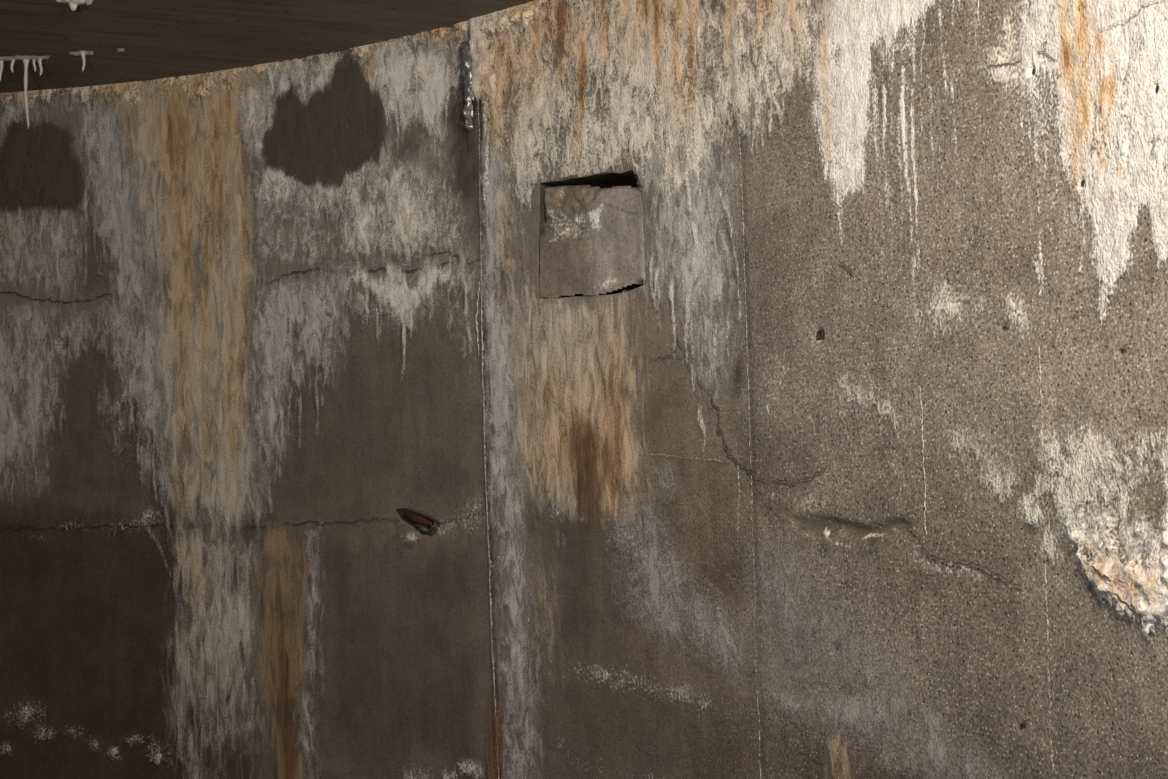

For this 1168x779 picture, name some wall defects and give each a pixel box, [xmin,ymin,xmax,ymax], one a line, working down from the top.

damp [56,0,93,11]
damp [882,86,892,158]
damp [891,65,921,241]
damp [977,0,1168,339]
crack [0,291,160,303]
damp [915,281,983,335]
damp [0,303,91,486]
damp [830,375,902,438]
rust [573,421,606,519]
crack [1090,565,1140,620]
damp [753,543,1006,779]
damp [443,762,481,779]